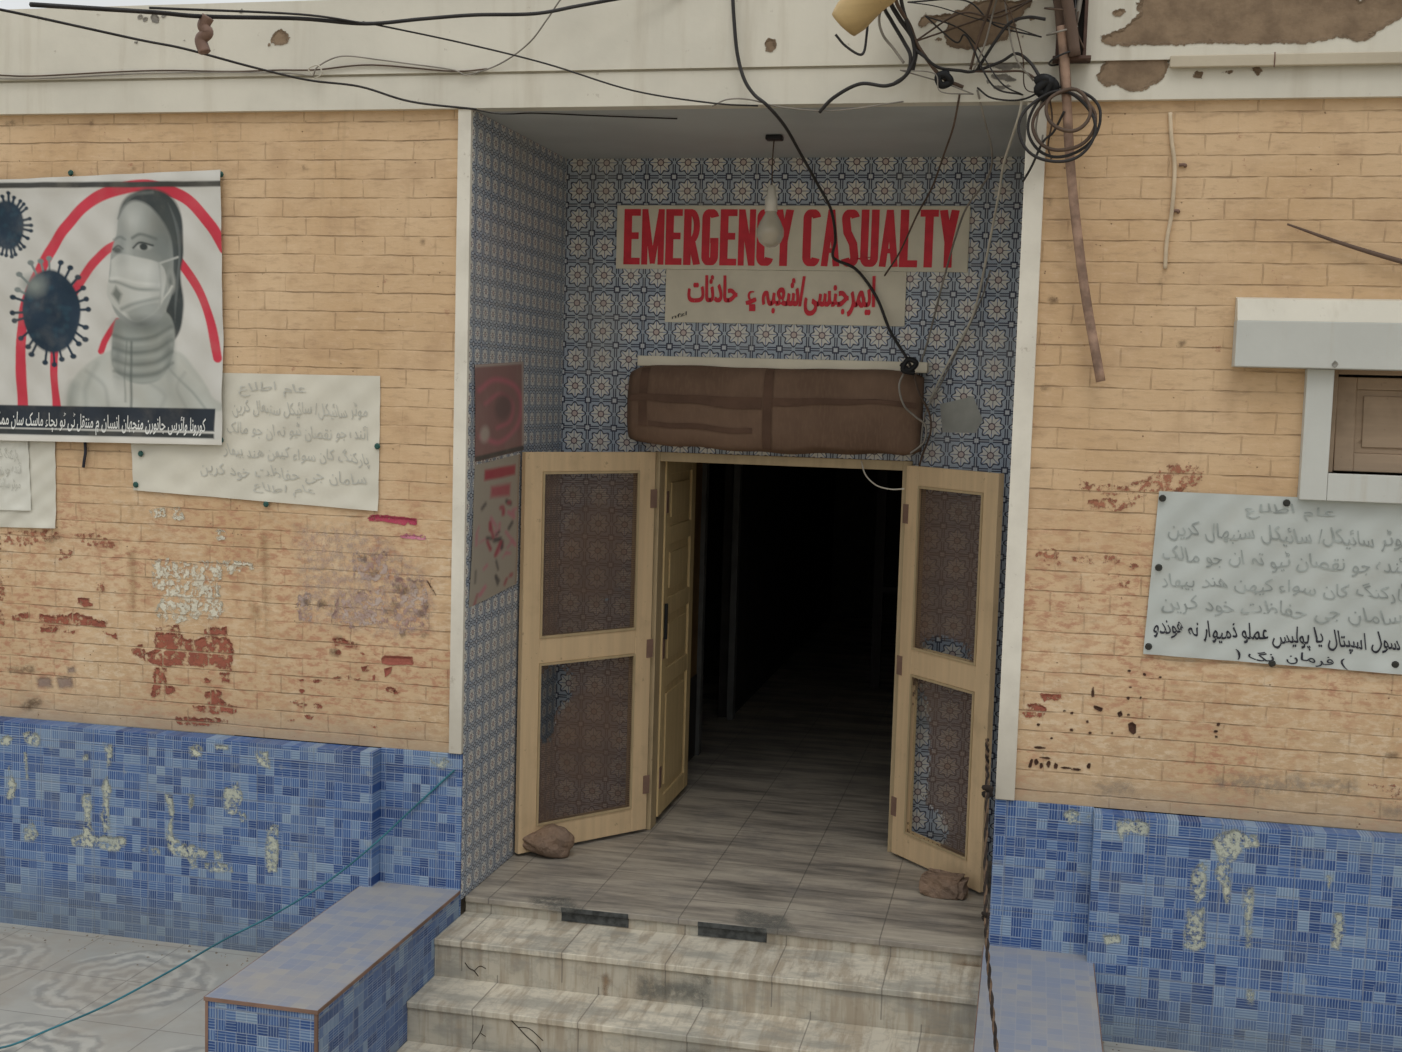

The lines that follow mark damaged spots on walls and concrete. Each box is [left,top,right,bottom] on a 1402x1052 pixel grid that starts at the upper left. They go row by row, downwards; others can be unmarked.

spalling [1096,0,1402,92]
peeling [1079,462,1202,512]
peeling [0,530,115,560]
peeling [0,574,118,639]
peeling [131,558,253,726]
peeling [1,731,40,778]
peeling [101,745,112,832]
peeling [265,825,279,872]
peeling [1184,863,1206,951]
peeling [1243,888,1254,948]